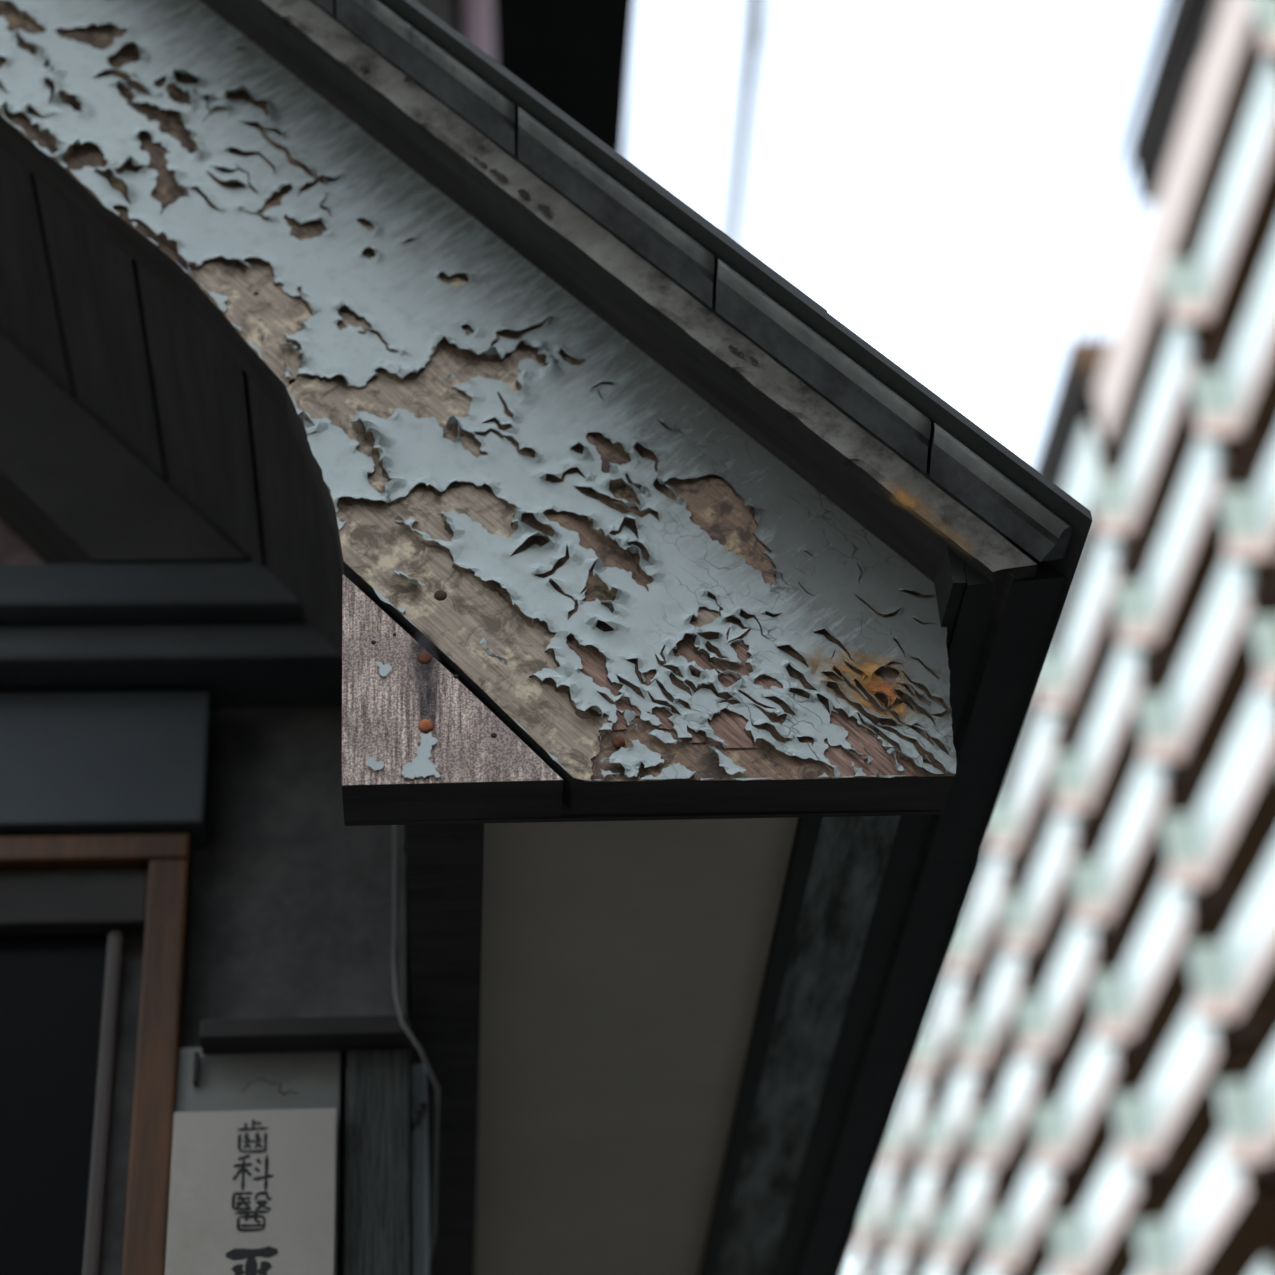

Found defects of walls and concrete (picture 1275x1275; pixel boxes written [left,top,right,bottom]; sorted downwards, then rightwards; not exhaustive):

peeling [0,0,956,781]